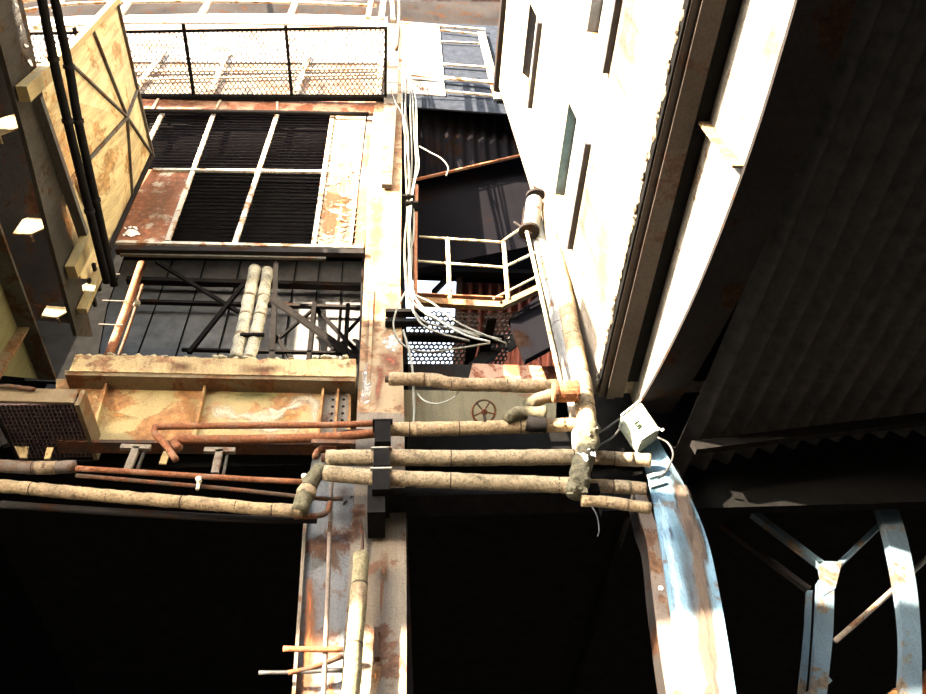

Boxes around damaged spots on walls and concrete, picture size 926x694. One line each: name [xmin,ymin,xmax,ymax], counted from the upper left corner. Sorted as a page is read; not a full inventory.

peeling [317,167,357,245]
corrosion [367,305,377,346]
corrosion [376,354,398,400]
corrosion [675,486,720,694]
corrosion [303,584,315,675]